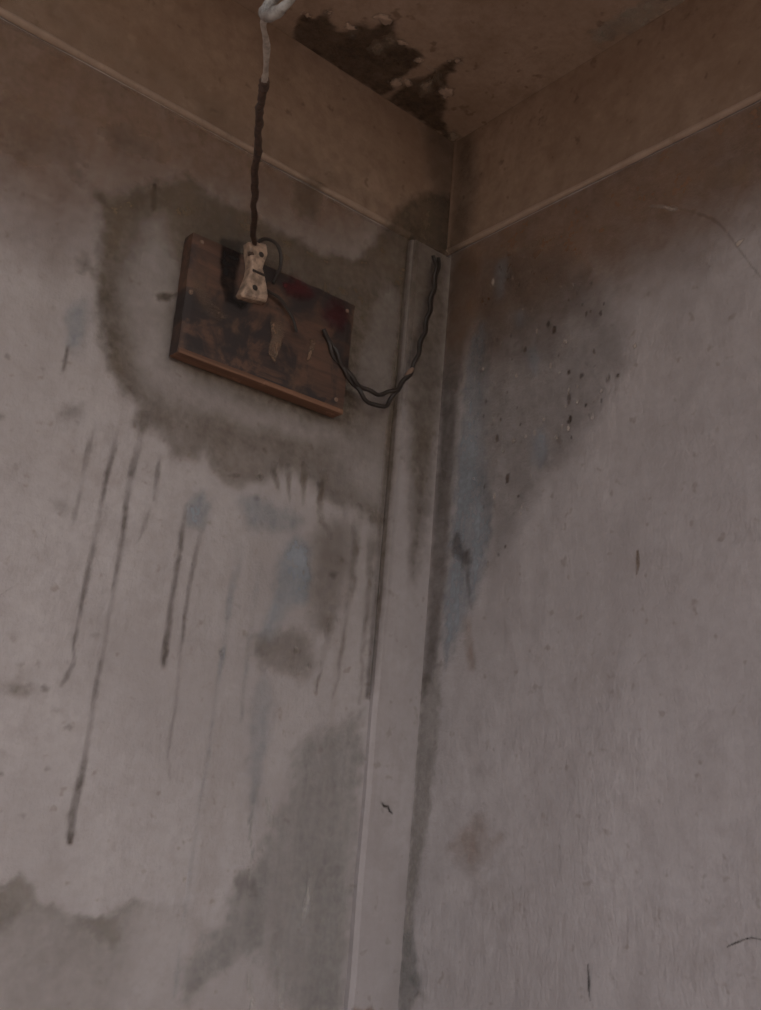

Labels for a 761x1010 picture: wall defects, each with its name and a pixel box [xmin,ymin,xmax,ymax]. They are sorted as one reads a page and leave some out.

spalling [295,12,463,141]
leakage [97,180,468,523]